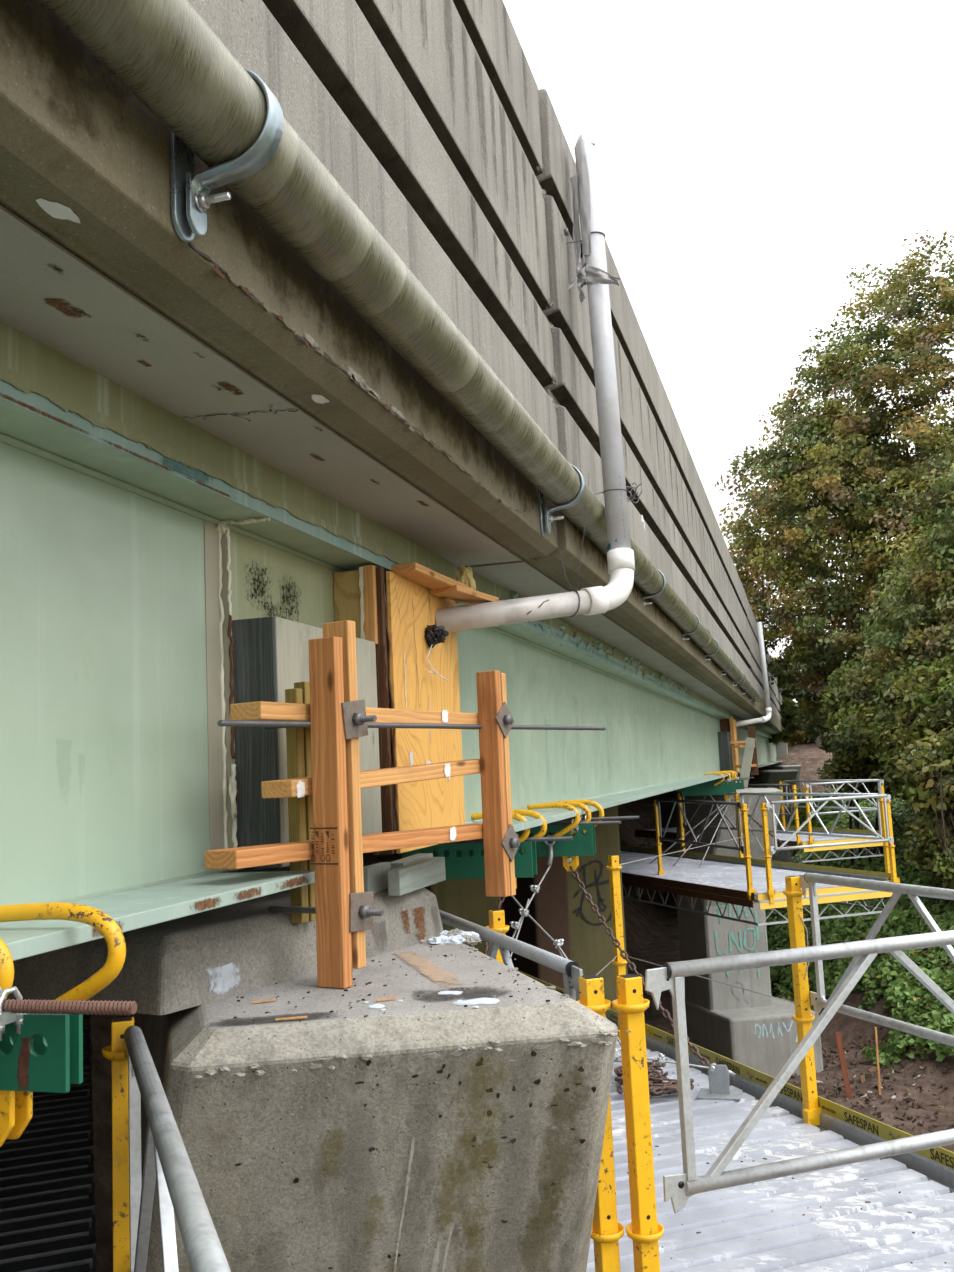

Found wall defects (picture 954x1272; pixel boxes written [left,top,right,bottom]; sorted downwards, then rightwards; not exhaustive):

corrosion [45,298,87,318]
corrosion [213,382,243,395]
peeling [0,364,411,564]
corrosion [237,887,261,900]
corrosion [190,897,219,911]
damp [393,1137,415,1272]
damp [431,1225,454,1272]